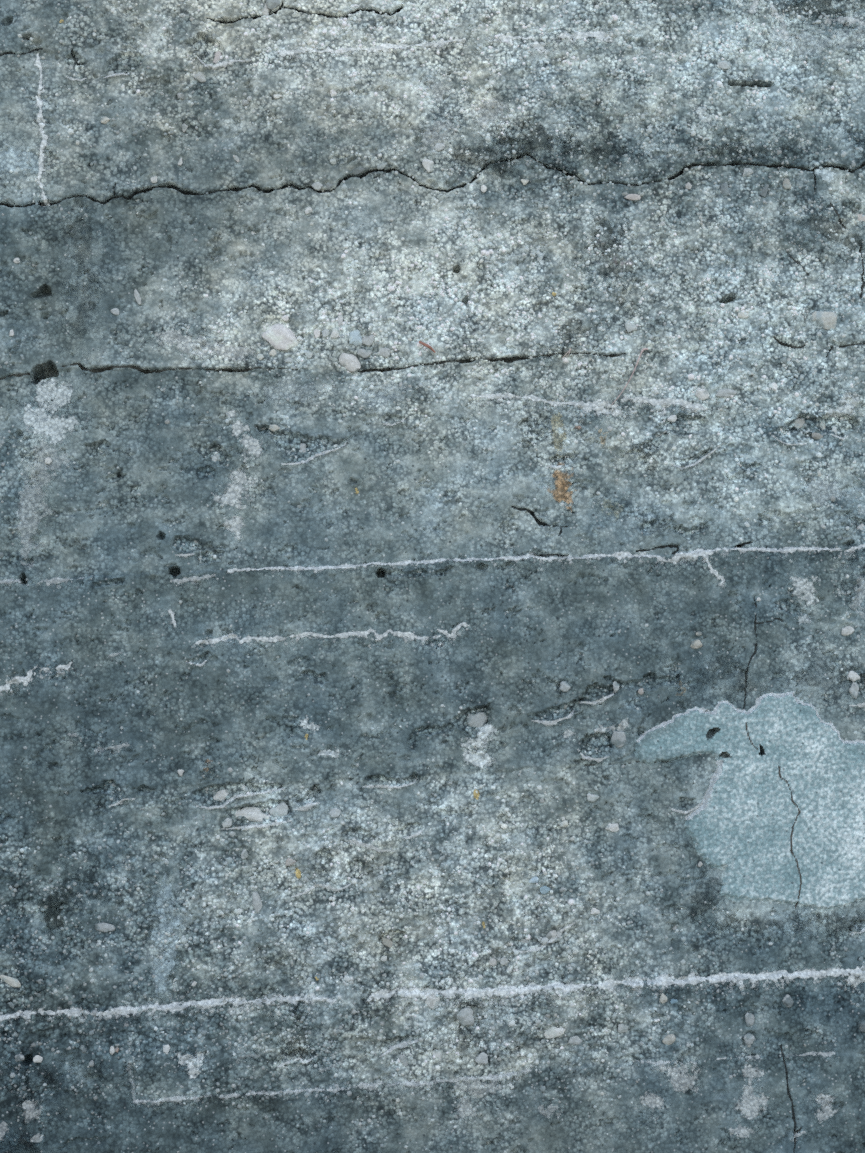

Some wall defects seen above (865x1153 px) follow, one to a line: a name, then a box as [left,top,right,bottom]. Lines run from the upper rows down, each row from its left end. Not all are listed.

crack [0,154,865,298]
crack [773,336,865,357]
crack [0,372,30,380]
crack [62,363,298,374]
crack [358,352,626,373]
rust [548,463,576,509]
crack [636,545,679,554]